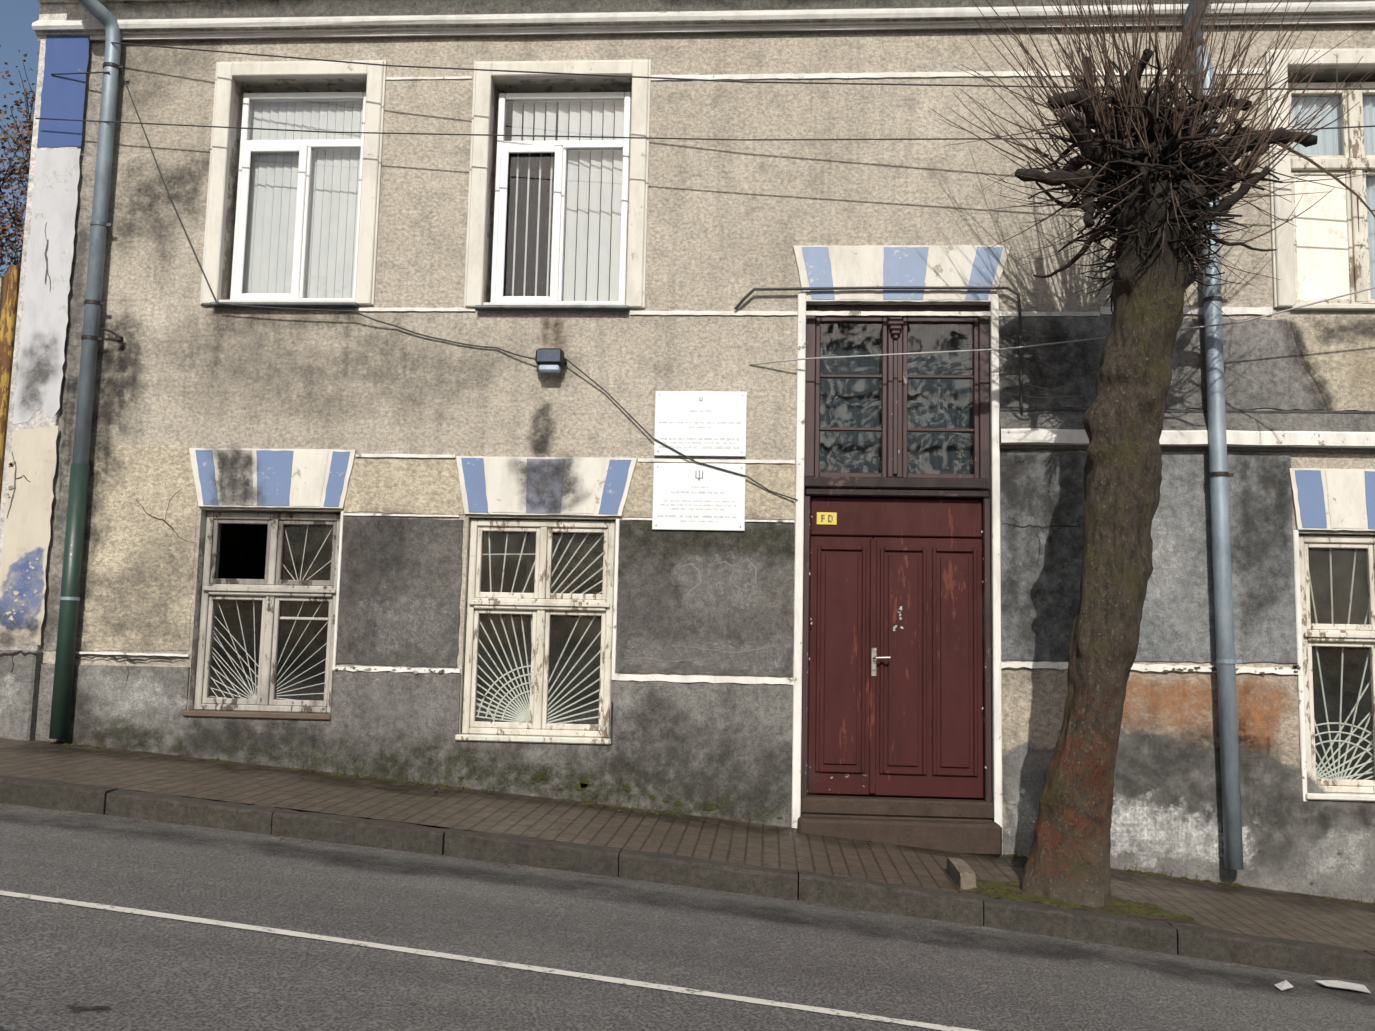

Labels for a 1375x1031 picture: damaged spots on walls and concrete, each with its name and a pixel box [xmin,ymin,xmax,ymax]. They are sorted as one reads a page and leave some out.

crack [43,222,51,292]
water stain [22,230,88,475]
water stain [92,322,136,424]
water stain [1290,325,1332,410]
water stain [518,442,579,511]
peeling [0,548,44,630]
water stain [1116,733,1218,822]
water stain [1239,746,1335,852]